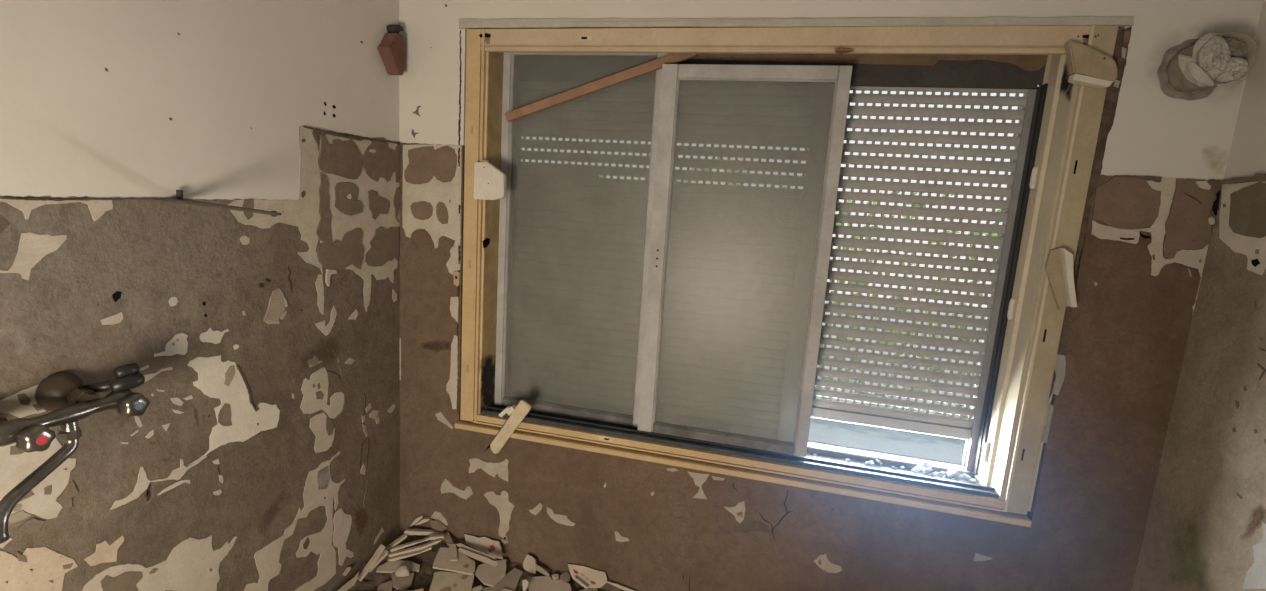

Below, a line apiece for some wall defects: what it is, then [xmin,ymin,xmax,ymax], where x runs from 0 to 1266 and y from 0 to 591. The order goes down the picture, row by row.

spalling [1209,179,1221,216]
spalling [258,279,288,324]
peeling [120,389,205,446]
peeling [157,480,190,495]